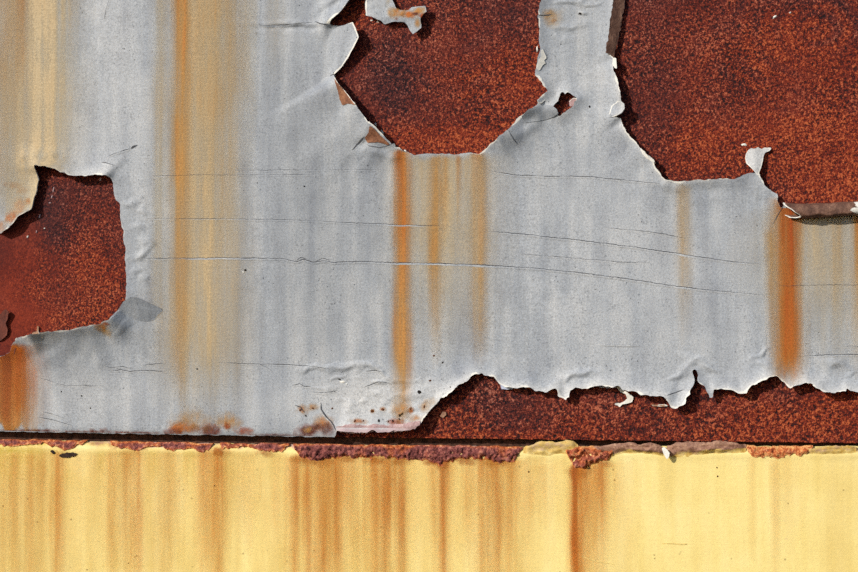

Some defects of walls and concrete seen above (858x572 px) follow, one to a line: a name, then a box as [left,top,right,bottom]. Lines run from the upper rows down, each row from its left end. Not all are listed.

peeling [0,165,163,362]
corrosion [169,0,247,381]
corrosion [354,151,485,424]
peeling [326,0,577,155]
peeling [606,0,858,218]
corrosion [770,203,858,371]
corrosion [110,405,524,529]
peeling [335,369,858,459]
corrosion [746,445,813,459]